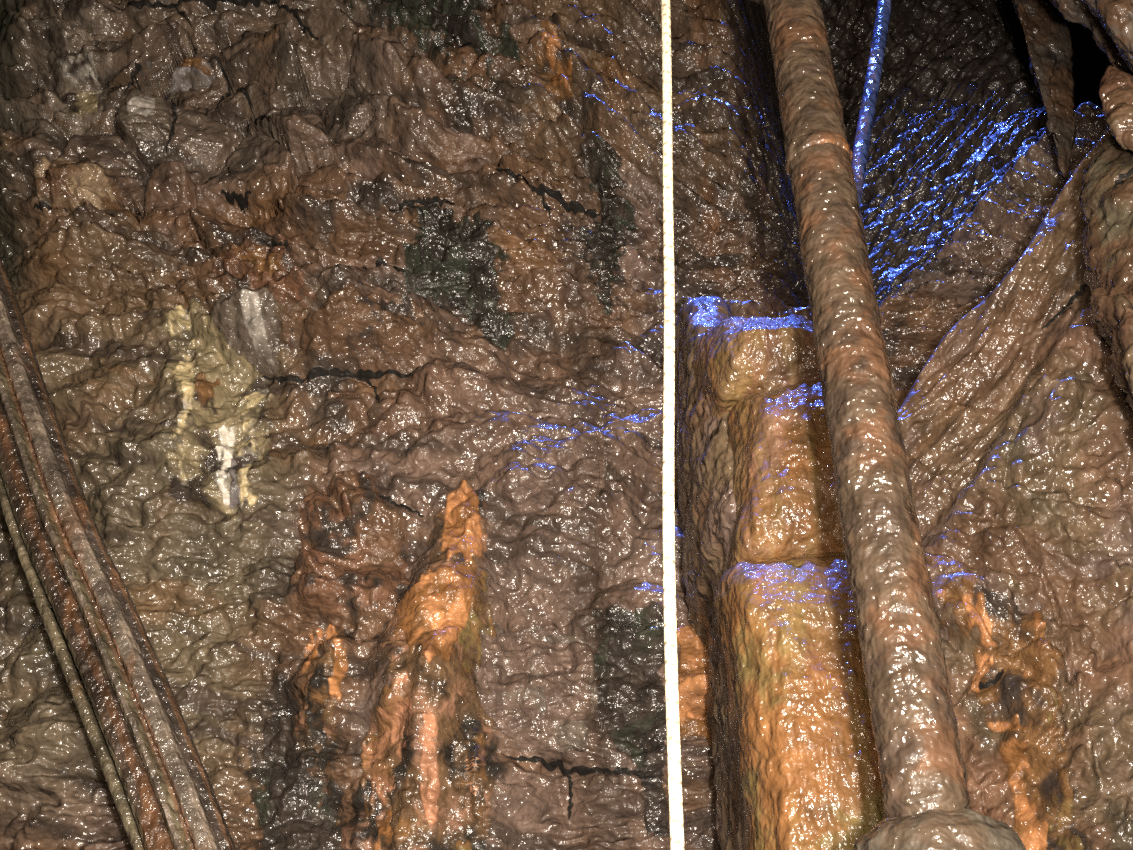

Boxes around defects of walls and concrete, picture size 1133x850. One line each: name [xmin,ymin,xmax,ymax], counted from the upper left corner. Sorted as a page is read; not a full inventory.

water stain [403,202,515,350]
water stain [160,296,272,524]
rust [291,624,348,782]
rust [340,478,507,850]
crack [501,753,664,818]
rust [936,573,1089,850]